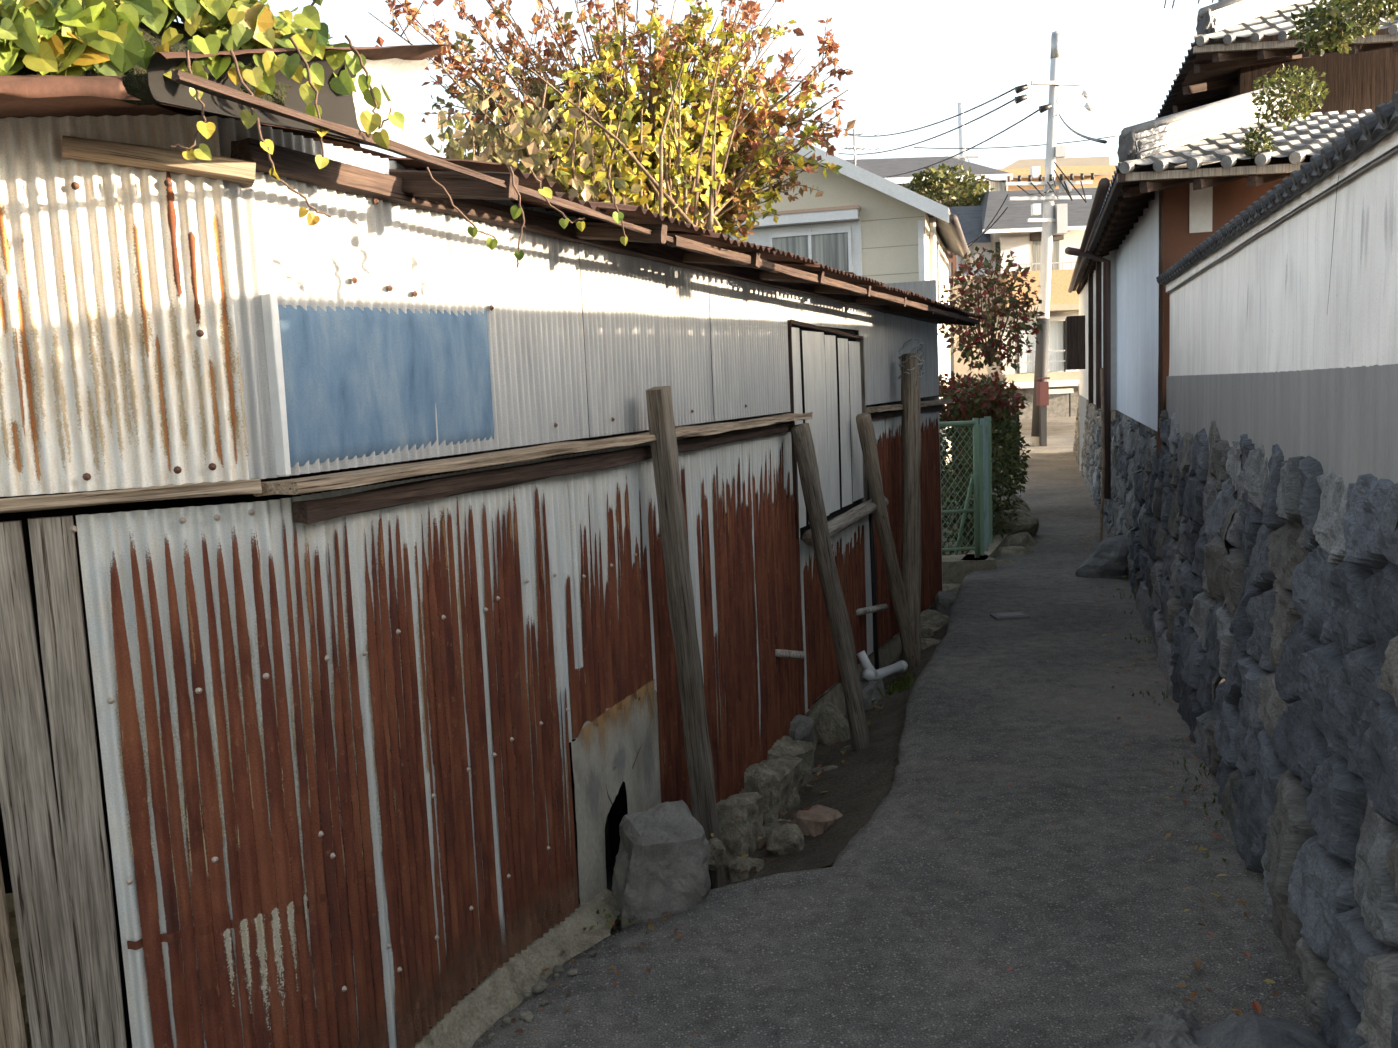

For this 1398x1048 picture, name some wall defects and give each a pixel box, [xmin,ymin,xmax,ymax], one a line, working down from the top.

rust [0,171,248,480]
rust [110,477,692,1048]
rust [681,443,841,803]
rust [832,425,902,665]
rust [920,418,942,613]